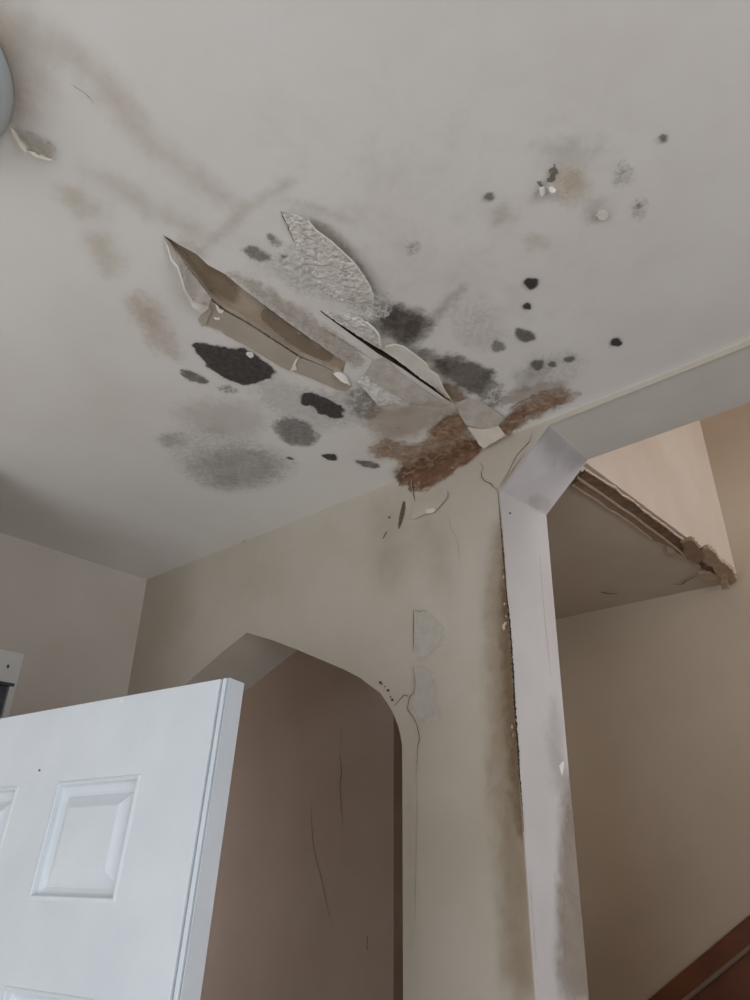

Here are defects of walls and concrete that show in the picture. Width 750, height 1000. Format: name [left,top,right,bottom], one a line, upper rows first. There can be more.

peeling [10,127,54,160]
damp [180,343,376,445]
spalling [162,234,403,406]
damp [244,234,500,407]
peeling [281,211,505,449]
mould [515,328,535,342]
mould [524,278,538,290]
mould [531,357,574,370]
spalling [572,468,737,590]
crack [379,672,420,849]
crack [480,432,533,830]
damp [503,588,523,832]